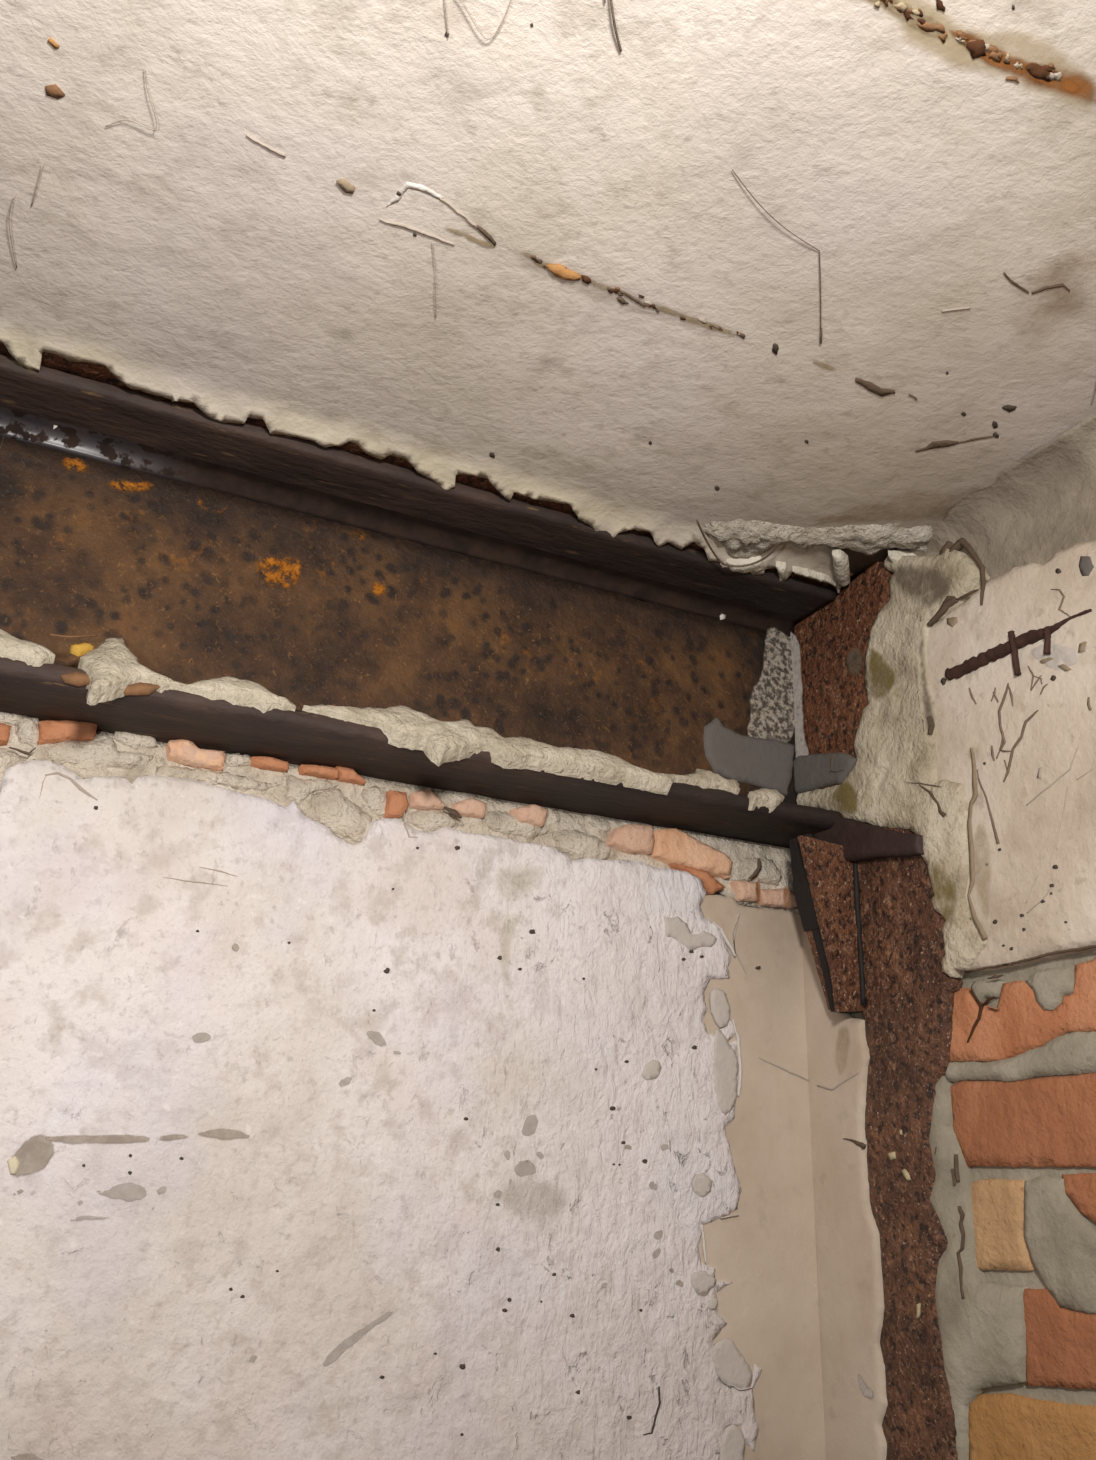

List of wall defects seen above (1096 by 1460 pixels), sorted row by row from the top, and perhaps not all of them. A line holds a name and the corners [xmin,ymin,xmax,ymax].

crack [872,0,1094,99]
rust [64,458,85,470]
rust [111,481,152,491]
rust [257,557,300,587]
crack [927,538,986,626]
crack [1051,589,1069,616]
rust [60,671,90,687]
rust [124,682,160,696]
peeling [0,712,888,1460]